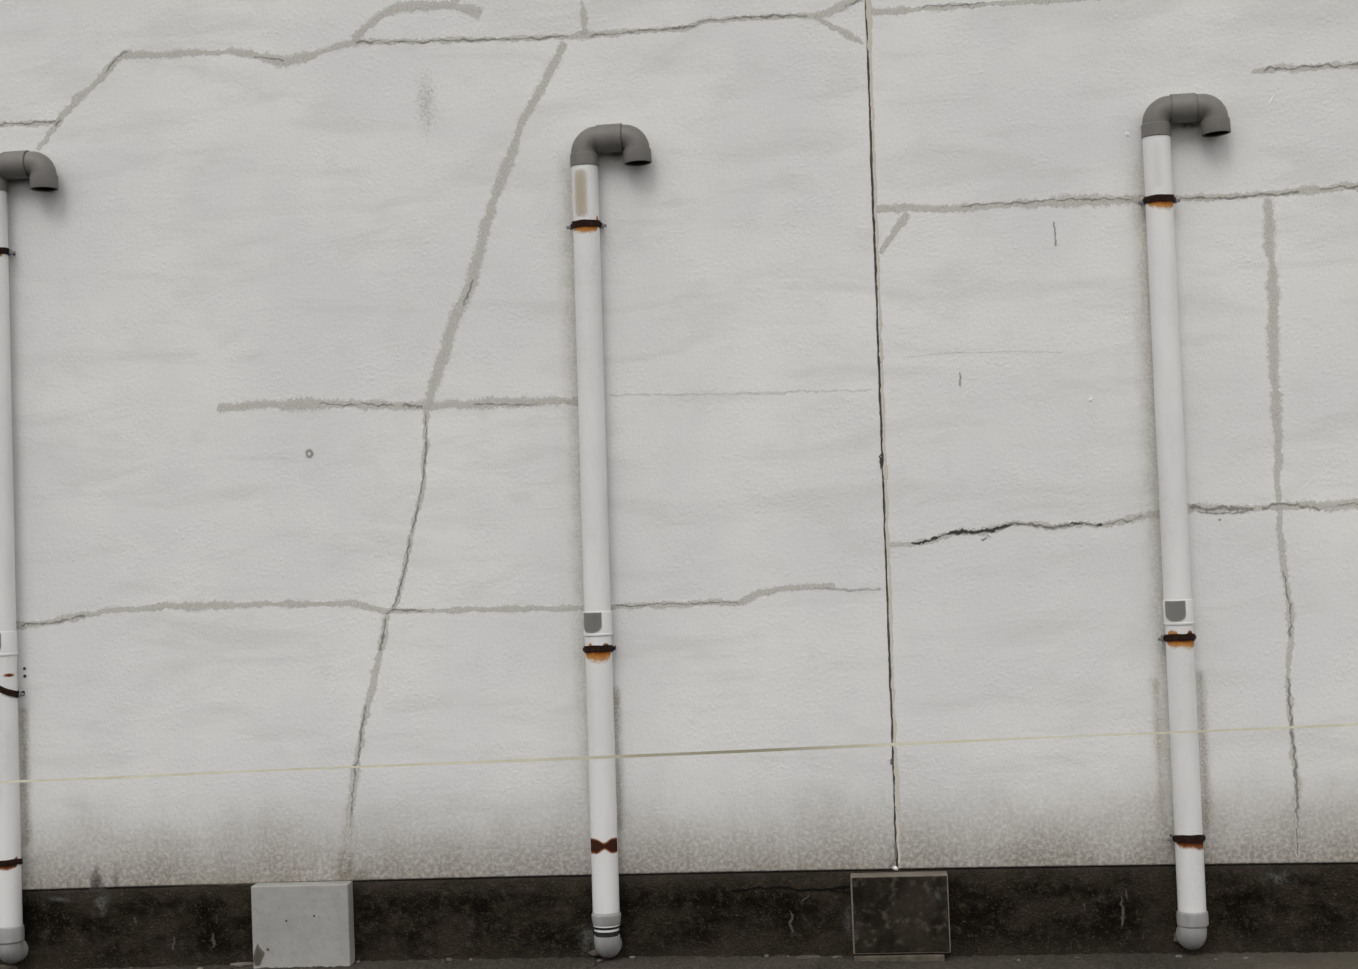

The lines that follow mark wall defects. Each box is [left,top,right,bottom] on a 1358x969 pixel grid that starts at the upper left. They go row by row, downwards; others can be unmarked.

crack [1252,61,1358,73]
crack [0,0,1081,872]
crack [877,182,1358,857]